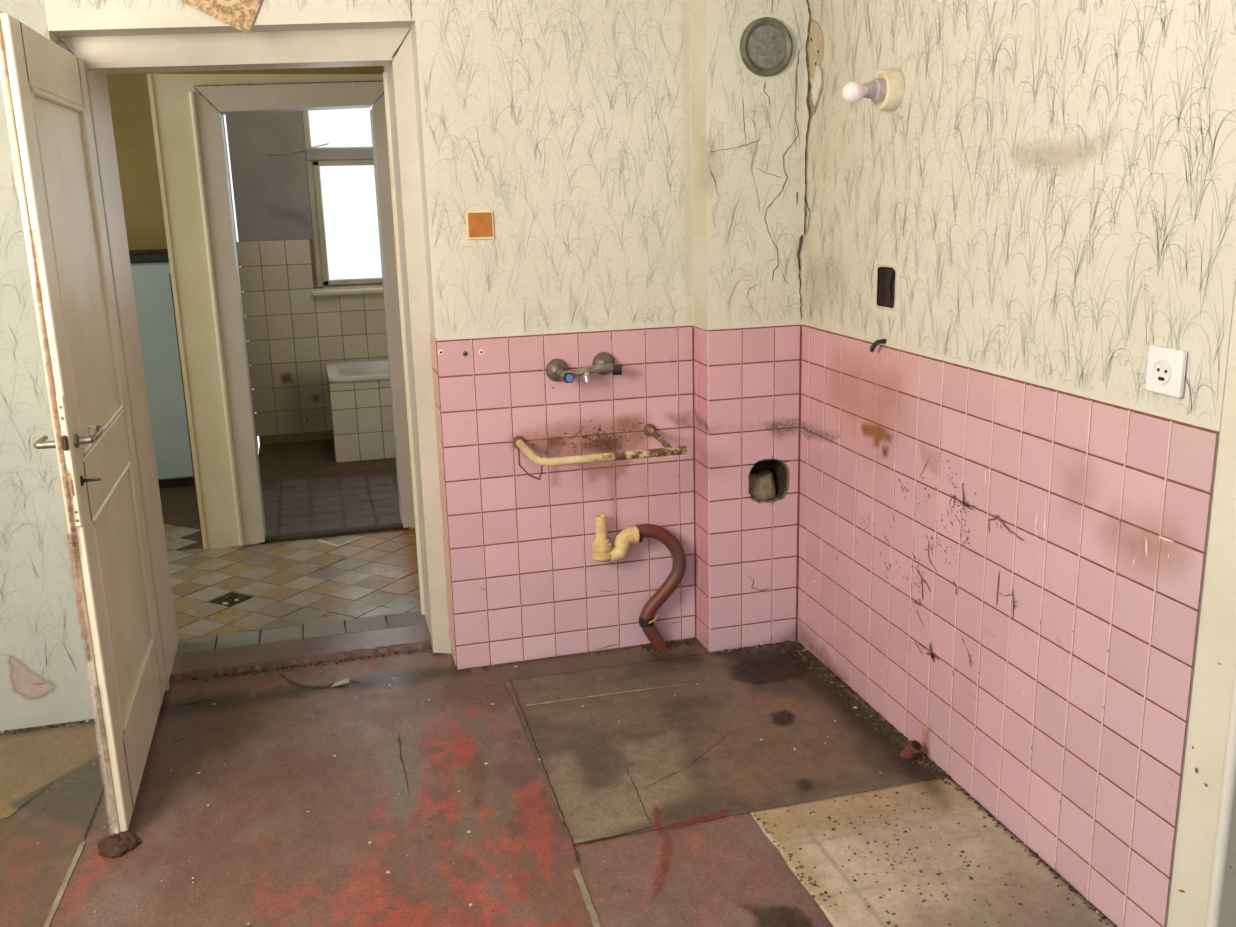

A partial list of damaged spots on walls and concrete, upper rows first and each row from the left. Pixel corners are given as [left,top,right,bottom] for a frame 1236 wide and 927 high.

peeling [809,38,822,116]
crack [709,0,810,319]
rust [532,420,644,455]
rust [863,426,890,454]
damp [746,906,811,927]